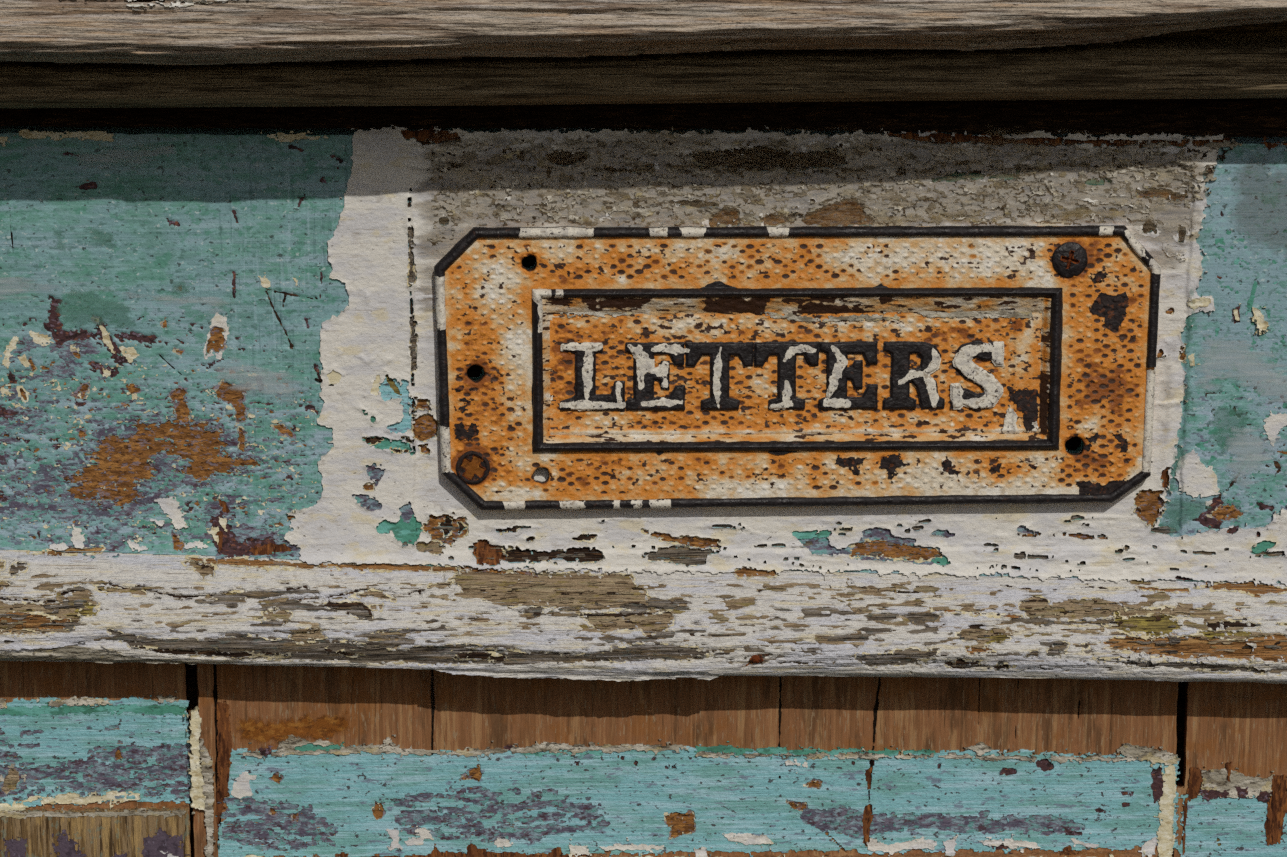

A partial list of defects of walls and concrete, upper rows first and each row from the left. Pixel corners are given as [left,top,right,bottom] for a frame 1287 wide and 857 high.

peeling [127,0,228,10]
corrosion [462,456,484,480]
peeling [0,125,1287,682]
crack [0,527,1287,778]
crack [212,666,220,815]
peeling [0,691,1287,857]